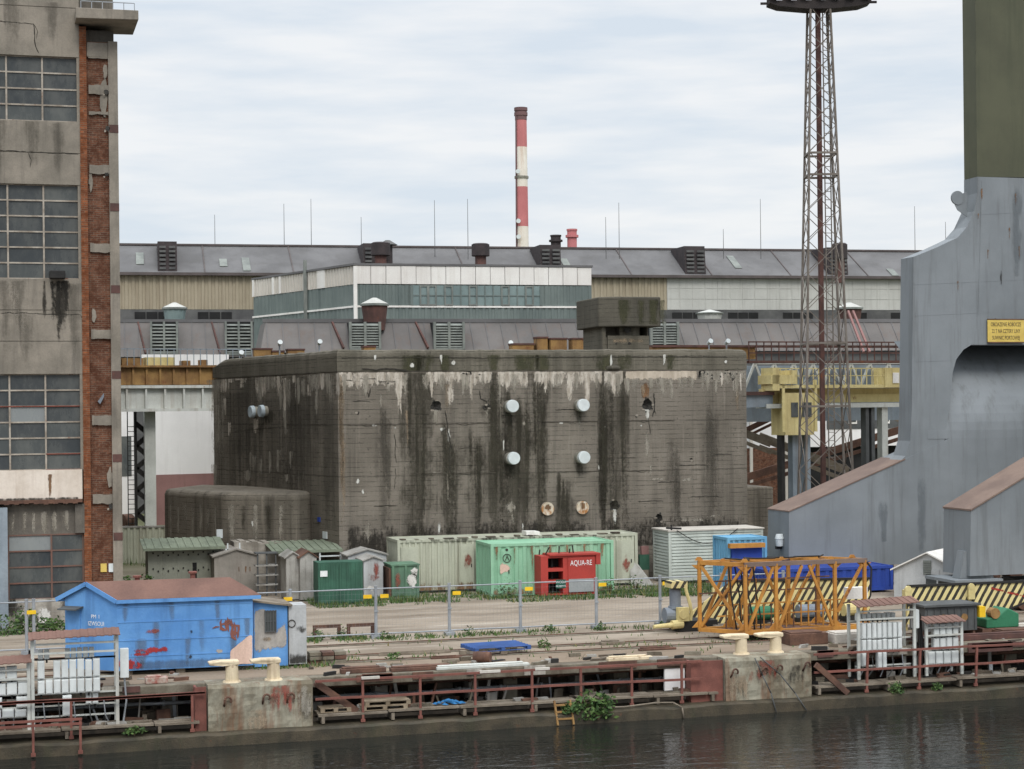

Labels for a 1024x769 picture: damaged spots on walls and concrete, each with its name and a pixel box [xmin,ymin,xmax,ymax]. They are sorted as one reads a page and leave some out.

leakage [43,281,68,338]
peeling [623,370,740,419]
leakage [207,355,663,535]